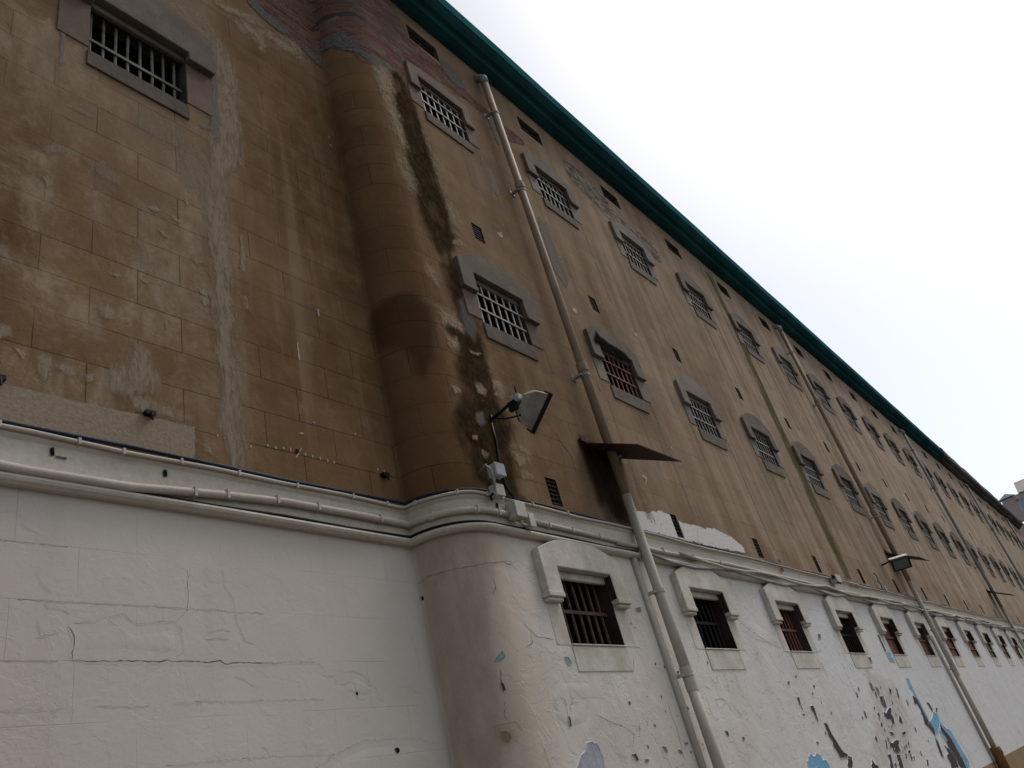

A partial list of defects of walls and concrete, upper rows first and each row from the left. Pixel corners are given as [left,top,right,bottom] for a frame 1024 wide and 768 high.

damp [201,39,248,469]
damp [372,66,533,503]
crack [0,510,383,712]
peeling [576,741,604,768]
spalling [796,666,853,768]
spalling [855,677,970,768]